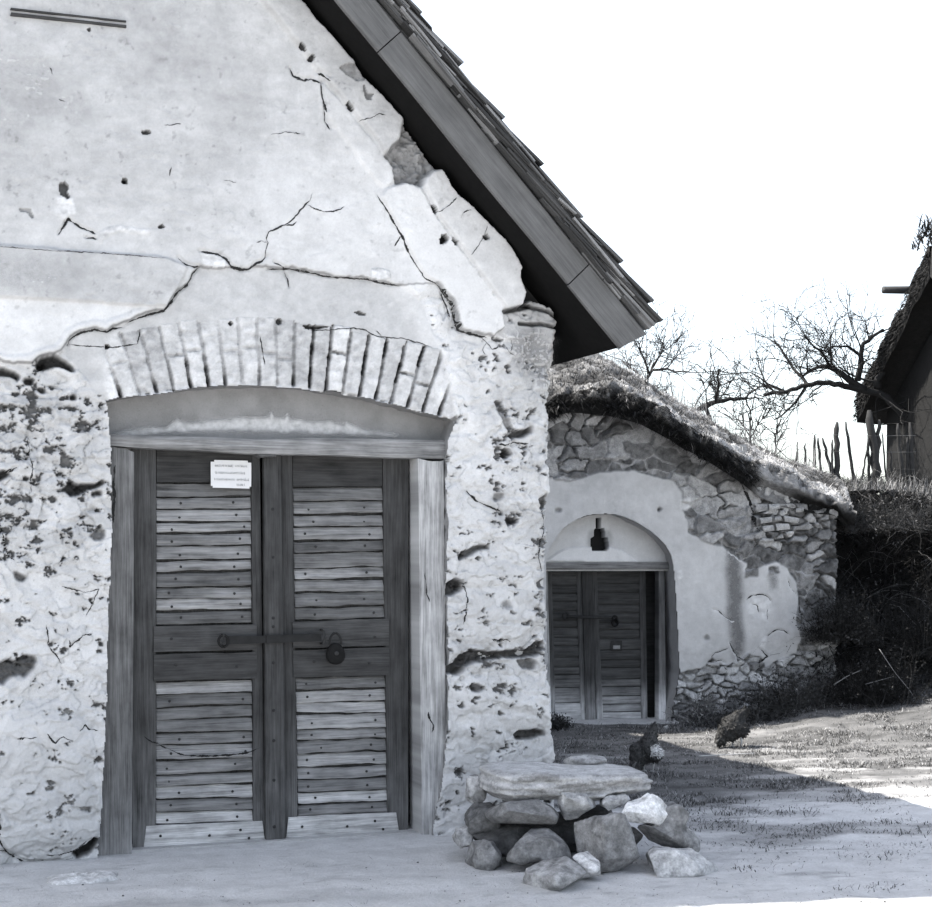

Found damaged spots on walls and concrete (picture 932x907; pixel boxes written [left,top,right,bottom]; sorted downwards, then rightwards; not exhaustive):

crack [290,70,330,129]
flaking render [384,127,435,187]
crack [0,195,397,348]
crack [378,197,515,356]
crack [306,327,428,346]
flaking render [0,252,838,836]
flaking render [0,802,102,865]